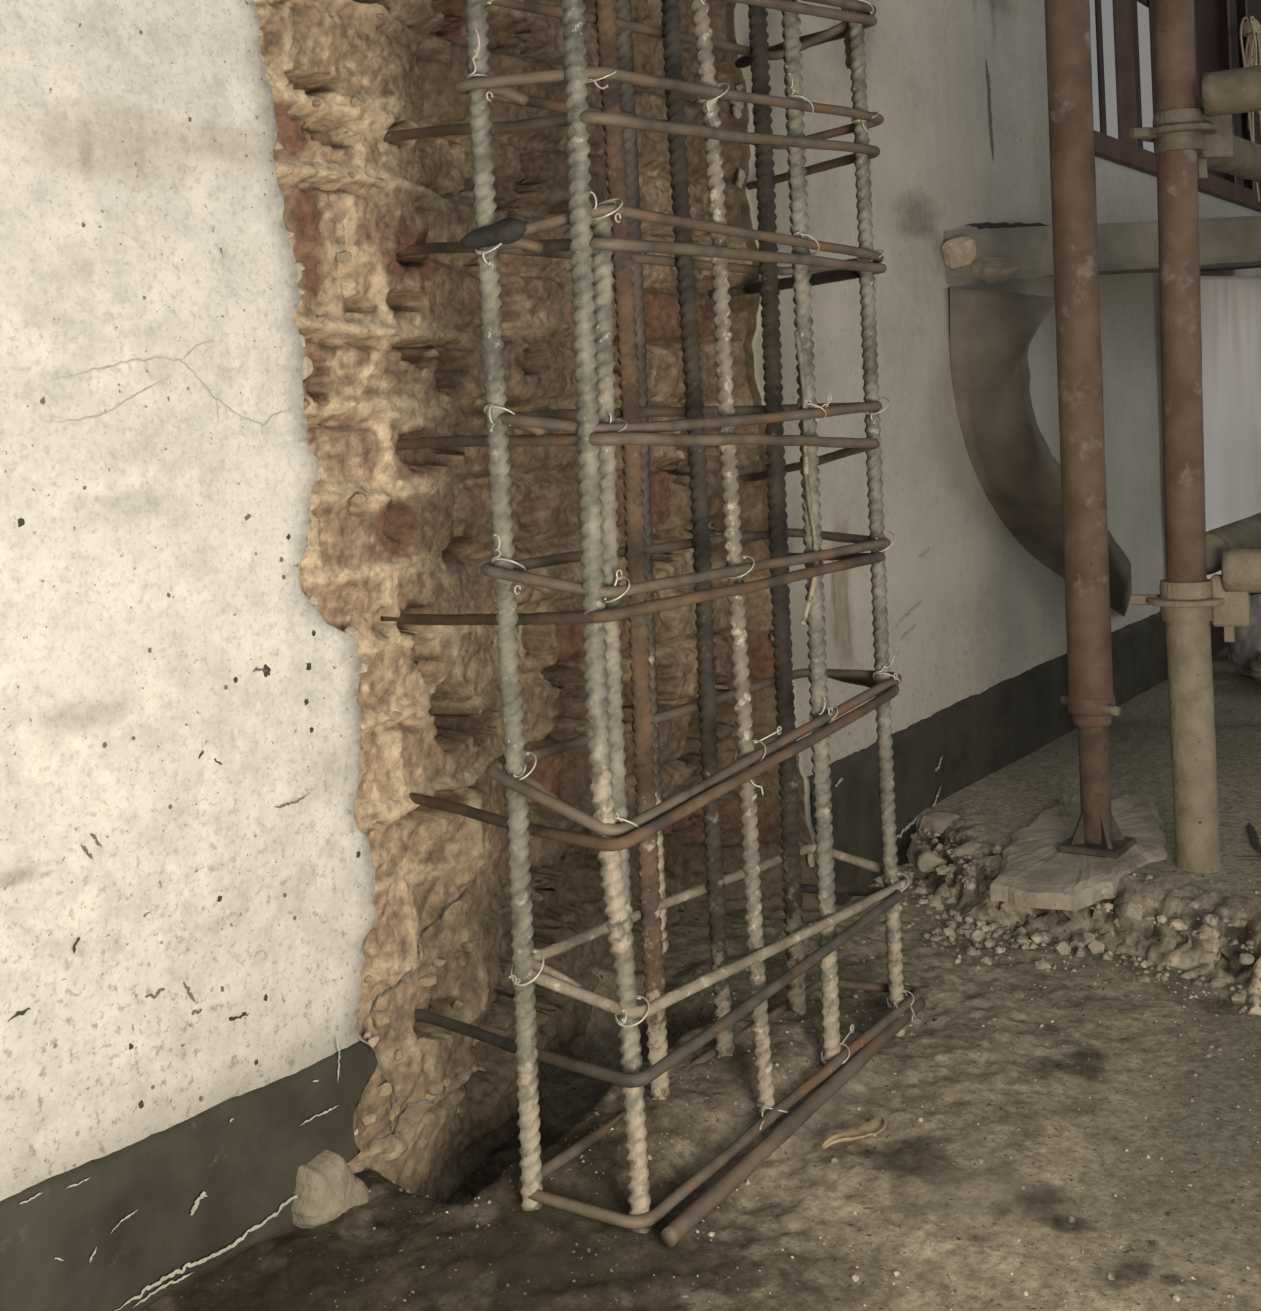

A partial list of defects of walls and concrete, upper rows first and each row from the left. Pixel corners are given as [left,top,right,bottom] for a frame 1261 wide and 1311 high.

spalling [485,0,572,240]
spalling [582,0,603,108]
spalling [586,124,610,206]
crack [46,340,304,435]
spalling [611,268,623,423]
spalling [630,0,785,929]
spalling [253,0,520,1204]
spalling [497,254,615,1096]
spalling [614,445,638,820]
spalling [81,833,102,859]
spalling [628,843,644,952]
spalling [183,982,202,1015]